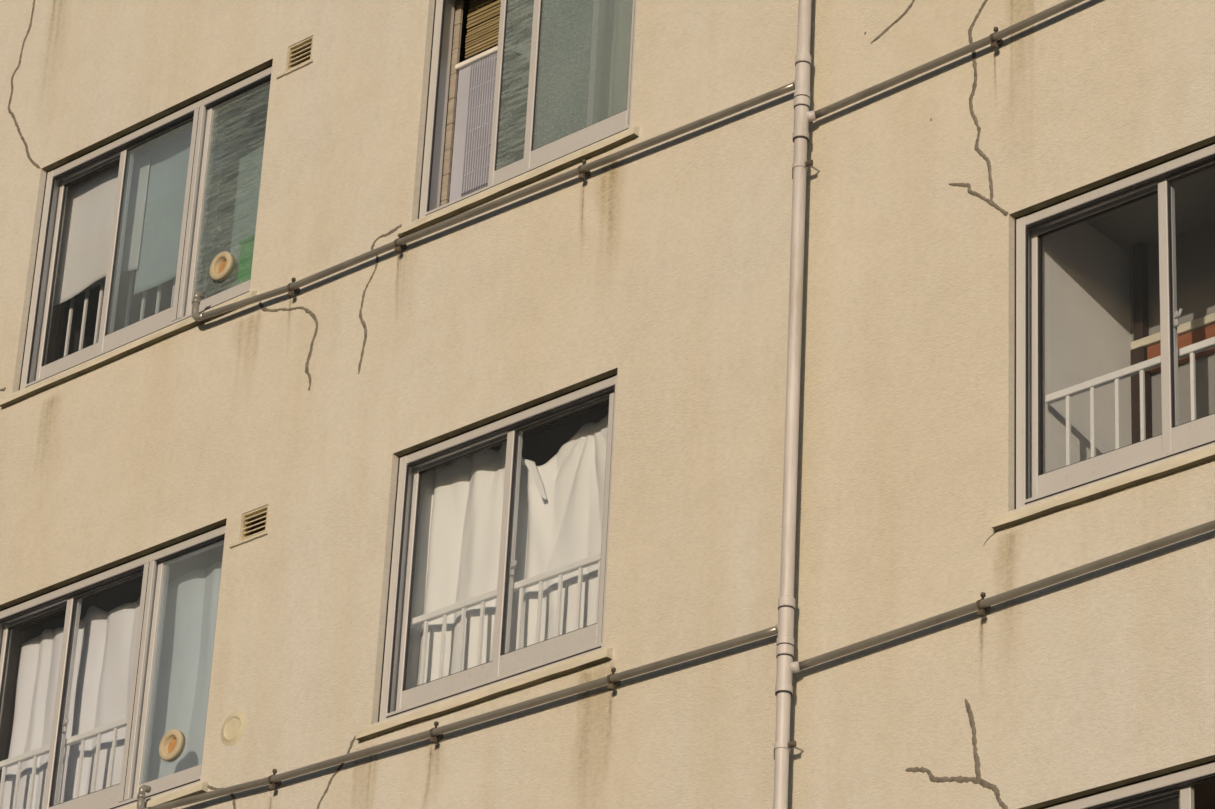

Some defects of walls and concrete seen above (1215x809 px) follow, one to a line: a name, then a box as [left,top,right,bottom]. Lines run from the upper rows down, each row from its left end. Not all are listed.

crack [871,0,915,44]
crack [8,0,41,169]
crack [949,0,1009,216]
crack [259,301,318,391]
crack [358,224,402,374]
crack [317,735,356,809]
crack [905,699,1008,809]